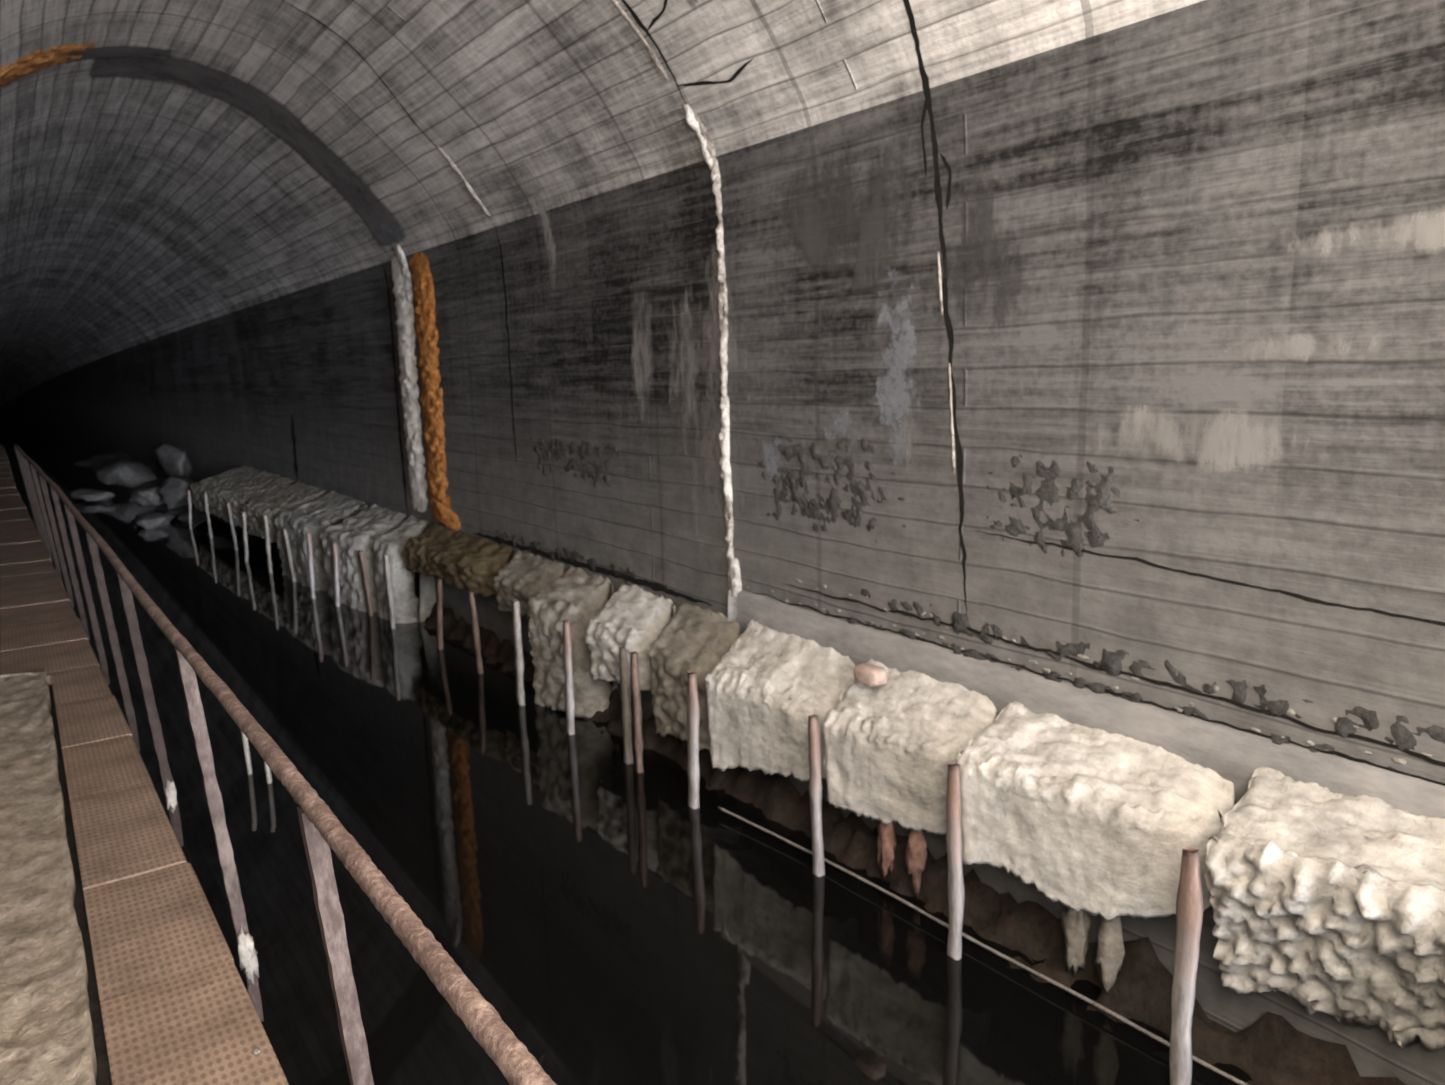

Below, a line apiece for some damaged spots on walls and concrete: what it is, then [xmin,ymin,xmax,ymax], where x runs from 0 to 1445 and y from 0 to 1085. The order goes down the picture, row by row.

rust [0,43,98,87]
leakage [66,46,428,512]
rust [409,252,460,531]
leakage [632,301,651,408]
leakage [673,104,742,614]
spalling [751,425,912,542]
leakage [876,287,919,464]
spalling [986,452,1139,557]
crack [903,0,1445,626]
leakage [1120,408,1279,471]
leakage [1251,335,1350,360]
leakage [1348,211,1445,250]